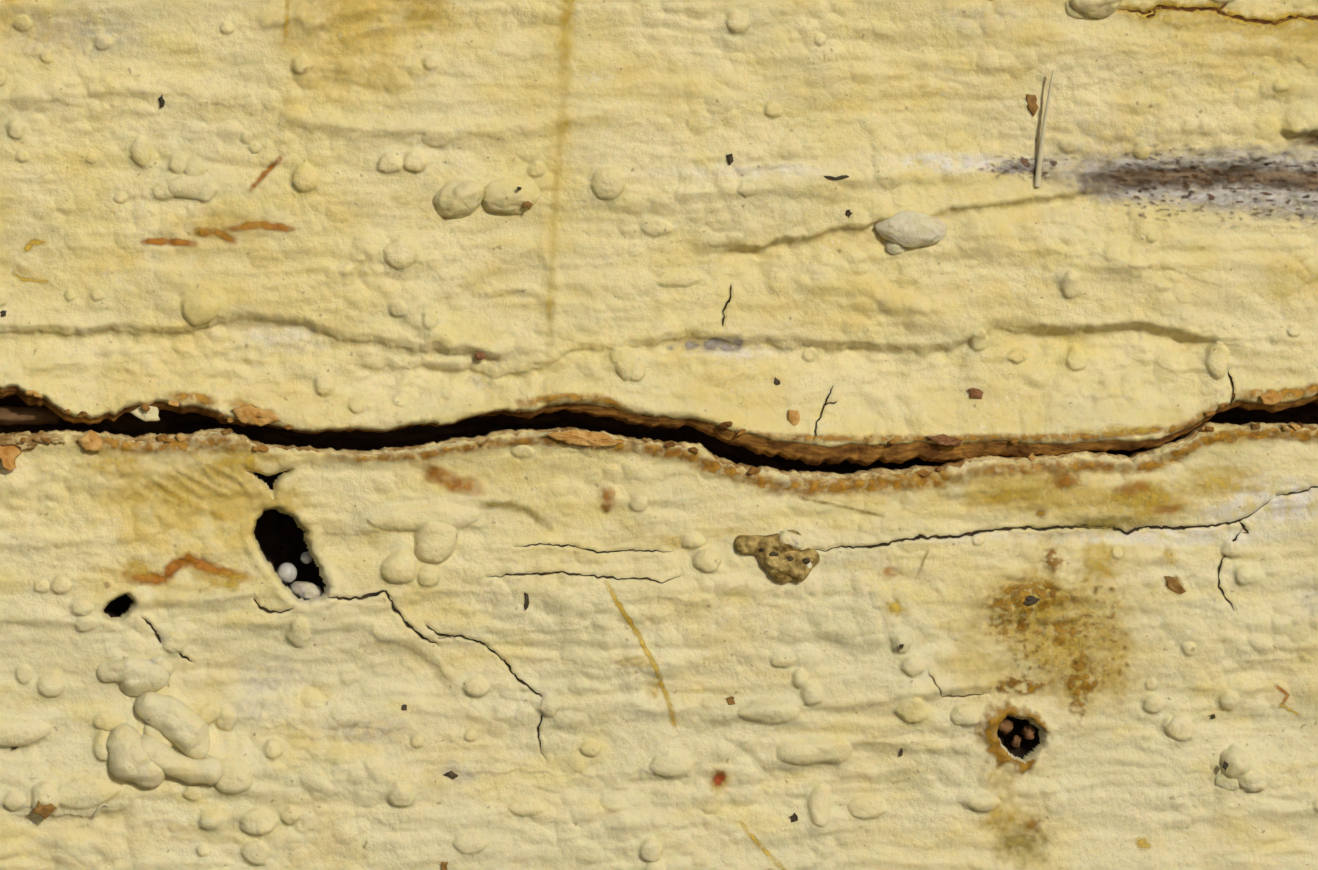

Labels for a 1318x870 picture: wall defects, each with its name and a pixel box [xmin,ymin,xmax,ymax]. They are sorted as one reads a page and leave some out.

crack [1119,1,1318,28]
crack [722,285,732,327]
crack [0,371,1318,496]
crack [491,543,680,584]
crack [814,486,1318,611]
crack [254,599,293,613]
crack [328,590,545,757]
crack [929,674,985,697]